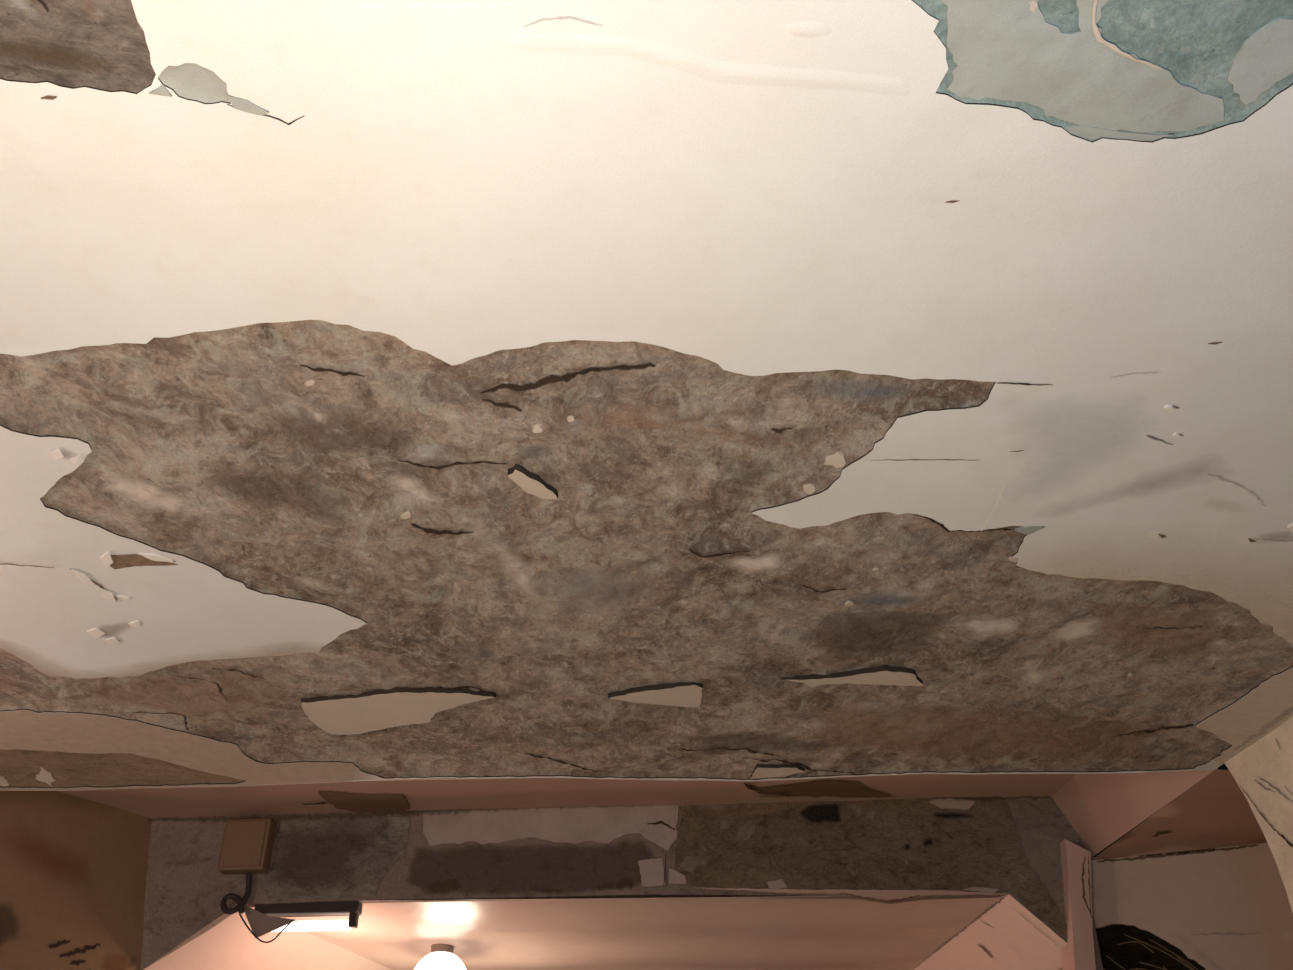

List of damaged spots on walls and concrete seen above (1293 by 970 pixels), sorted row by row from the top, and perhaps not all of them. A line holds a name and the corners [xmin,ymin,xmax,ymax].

spalling [0,0,304,125]
spalling [913,0,1293,141]
spalling [0,320,1293,939]